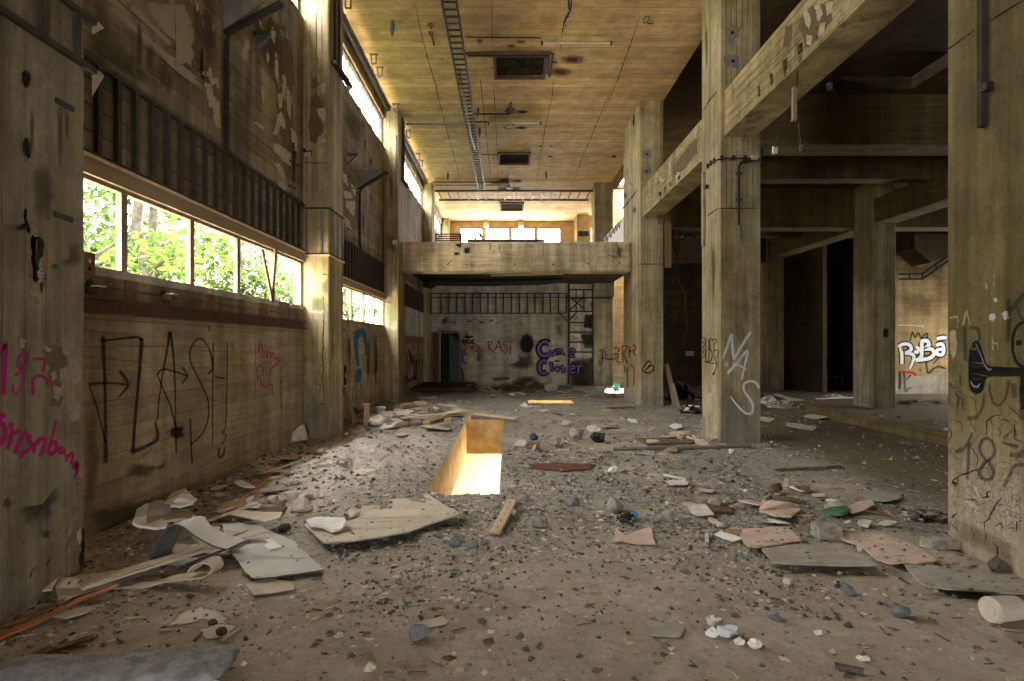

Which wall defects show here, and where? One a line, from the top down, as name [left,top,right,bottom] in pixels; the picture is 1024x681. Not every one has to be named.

peeling [199,48,221,128]
peeling [254,18,326,198]
spalling [6,208,47,297]
crack [947,375,1022,556]